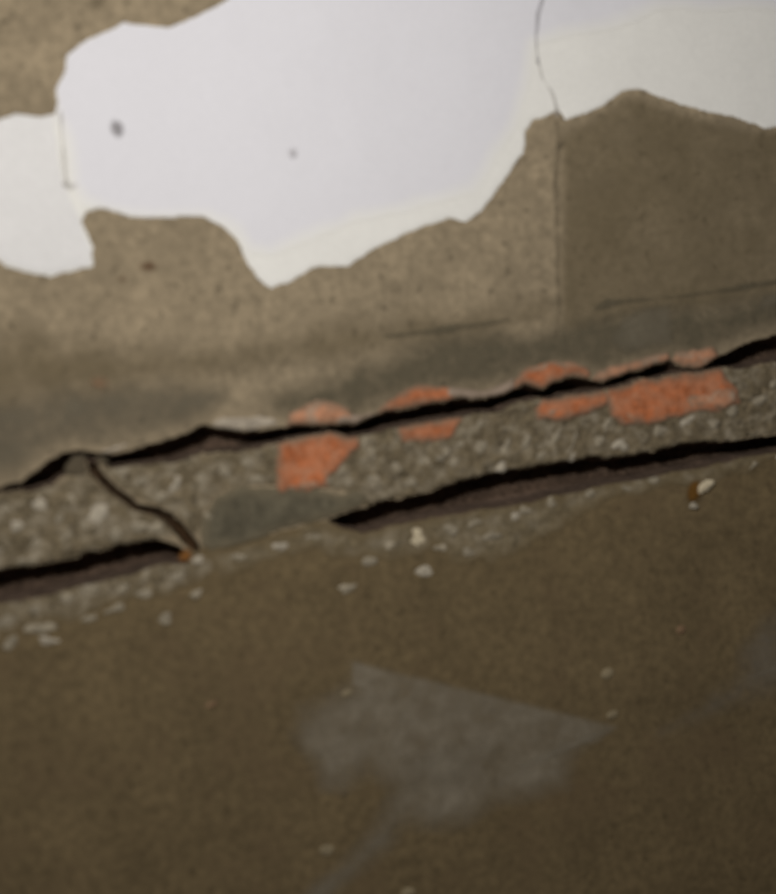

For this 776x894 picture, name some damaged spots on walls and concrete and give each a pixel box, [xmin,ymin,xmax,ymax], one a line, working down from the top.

peeling [0,0,776,288]
crack [0,335,776,603]